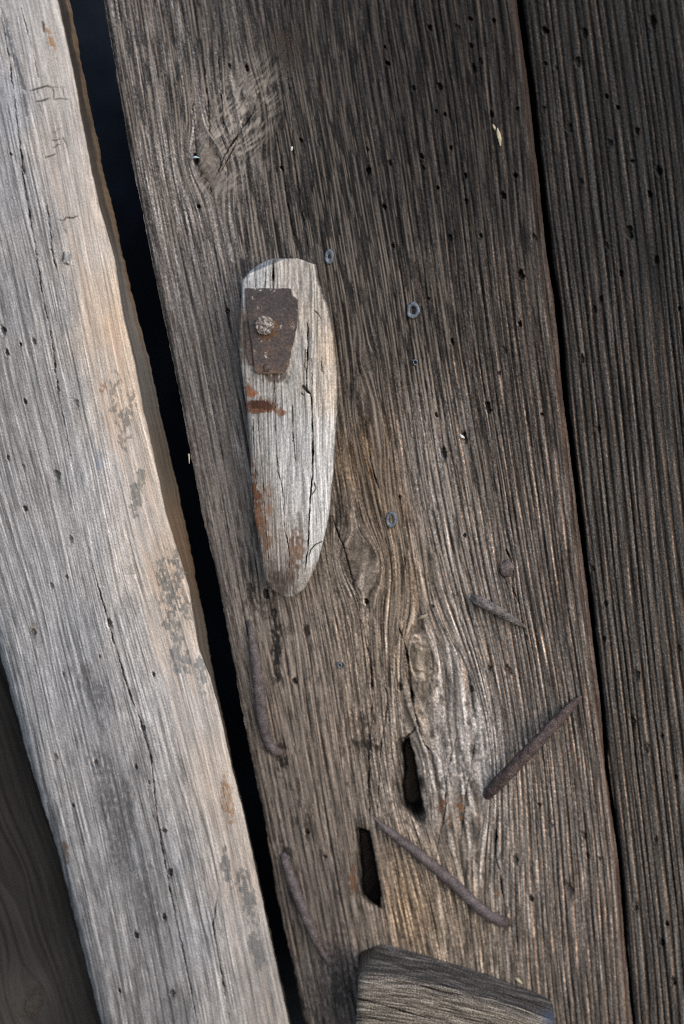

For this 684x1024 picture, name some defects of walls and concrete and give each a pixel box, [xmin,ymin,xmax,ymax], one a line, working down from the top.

corrosion [244,384,285,416]
crack [252,331,360,611]
corrosion [252,473,272,552]
corrosion [287,528,304,580]